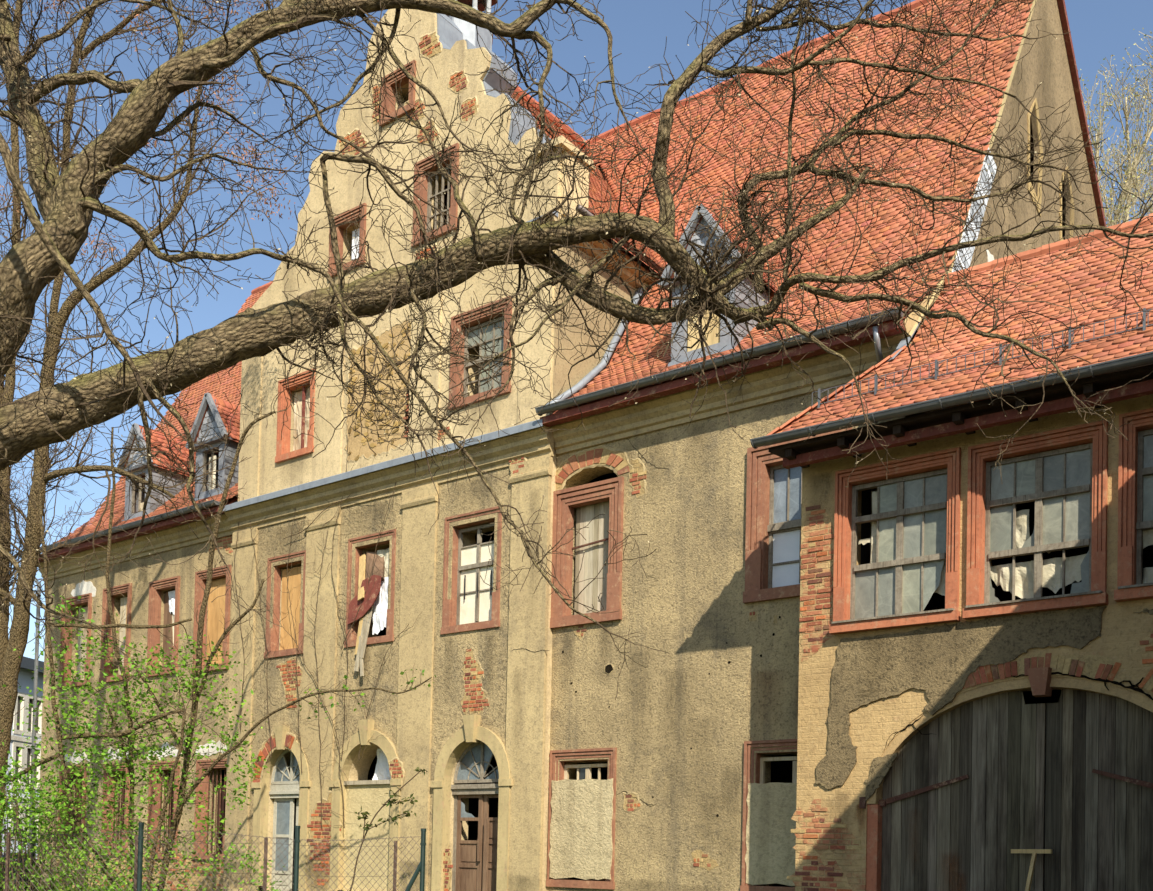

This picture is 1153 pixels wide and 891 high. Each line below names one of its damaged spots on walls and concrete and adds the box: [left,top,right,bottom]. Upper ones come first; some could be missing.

flaking render [276,656,303,711]
flaking render [460,647,490,715]
peeling [787,502,1122,891]
crack [1011,672,1153,700]
flaking render [307,791,342,891]